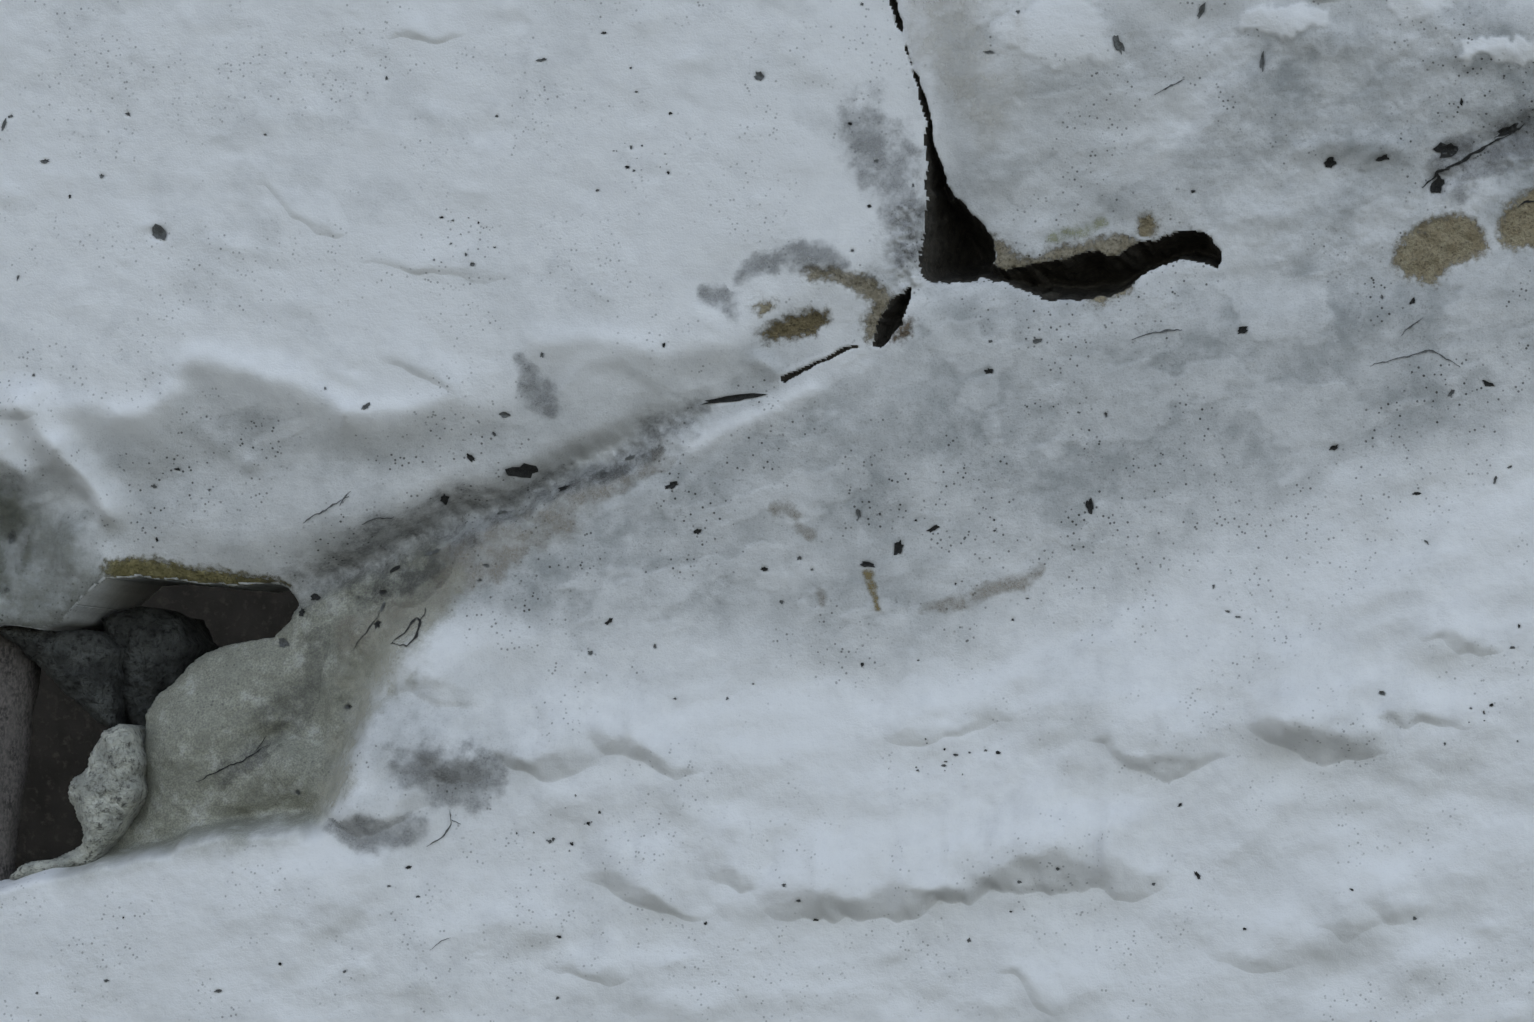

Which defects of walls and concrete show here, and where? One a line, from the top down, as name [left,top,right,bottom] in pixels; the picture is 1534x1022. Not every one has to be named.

crack [889,0,931,121]
spalling [1392,189,1534,304]
spalling [753,302,830,342]
spalling [801,265,912,348]
crack [1132,329,1181,340]
crack [781,345,858,383]
spalling [102,537,292,587]